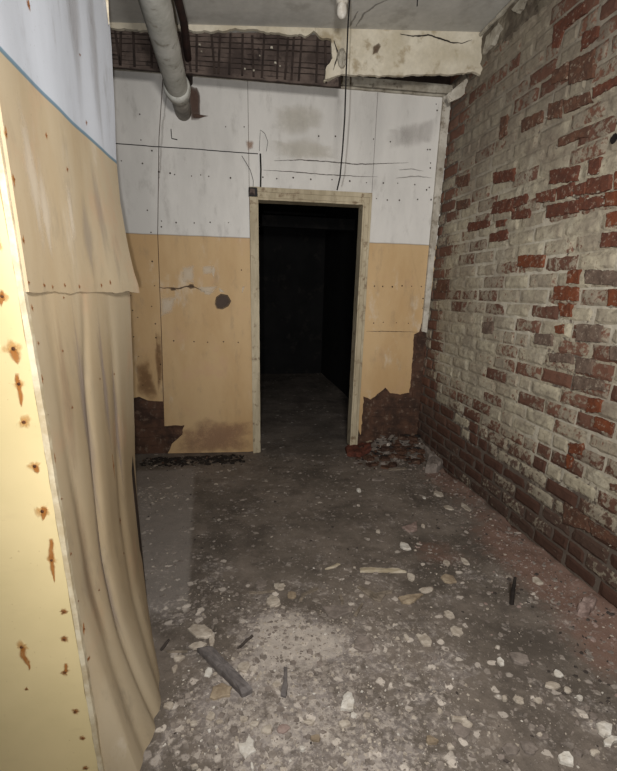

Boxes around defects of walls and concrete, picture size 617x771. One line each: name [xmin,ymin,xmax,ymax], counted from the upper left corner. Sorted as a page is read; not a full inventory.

flaking render [110,30,161,73]
flaking render [177,31,341,89]
crack [401,34,470,44]
peeling [519,26,617,133]
peeling [551,3,588,48]
peeling [467,157,617,248]
peeling [517,254,546,268]
peeling [160,269,231,312]
rust [8,344,19,363]
peeling [533,269,617,435]
rust [15,375,23,406]
rust [19,644,30,669]